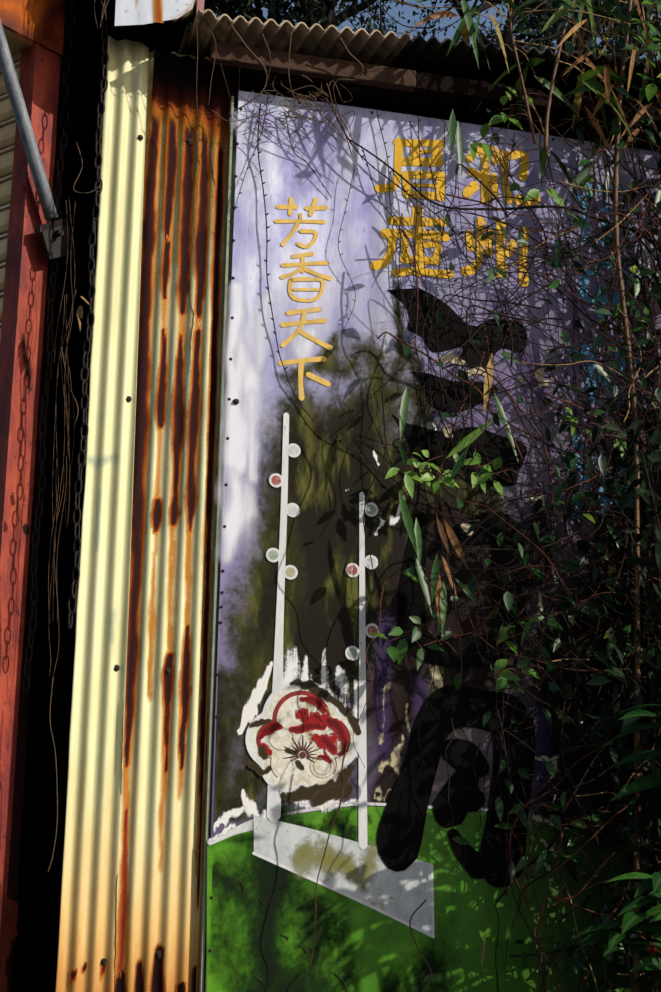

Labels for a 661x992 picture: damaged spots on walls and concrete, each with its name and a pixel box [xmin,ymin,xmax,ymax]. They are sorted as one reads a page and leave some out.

corrosion [0,0,47,31]
corrosion [153,0,163,23]
corrosion [100,51,240,992]
corrosion [70,961,88,985]